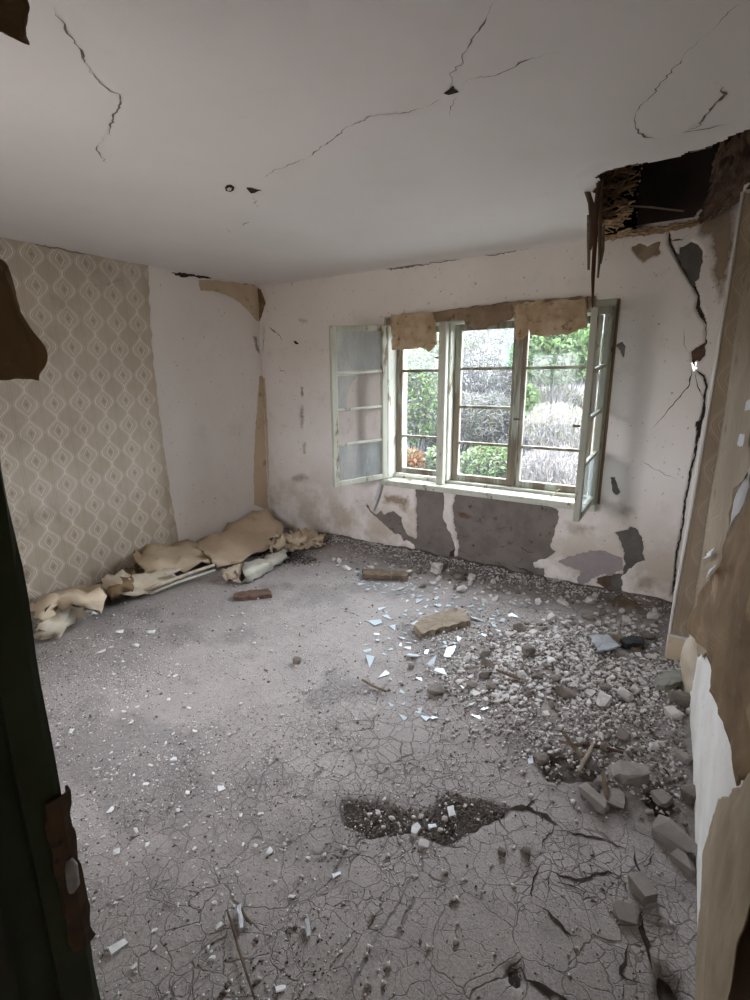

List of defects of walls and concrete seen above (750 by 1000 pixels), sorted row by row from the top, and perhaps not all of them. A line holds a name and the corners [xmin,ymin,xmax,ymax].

crack [54,8,122,162]
crack [265,3,539,177]
crack [634,4,739,139]
flaking render [698,129,750,224]
flaking render [632,241,661,262]
flaking render [677,242,703,286]
crack [640,232,708,593]
flaking render [691,341,707,362]
flaking render [366,489,645,590]
crack [556,718,676,785]
crack [342,873,414,999]
crack [497,799,655,1000]